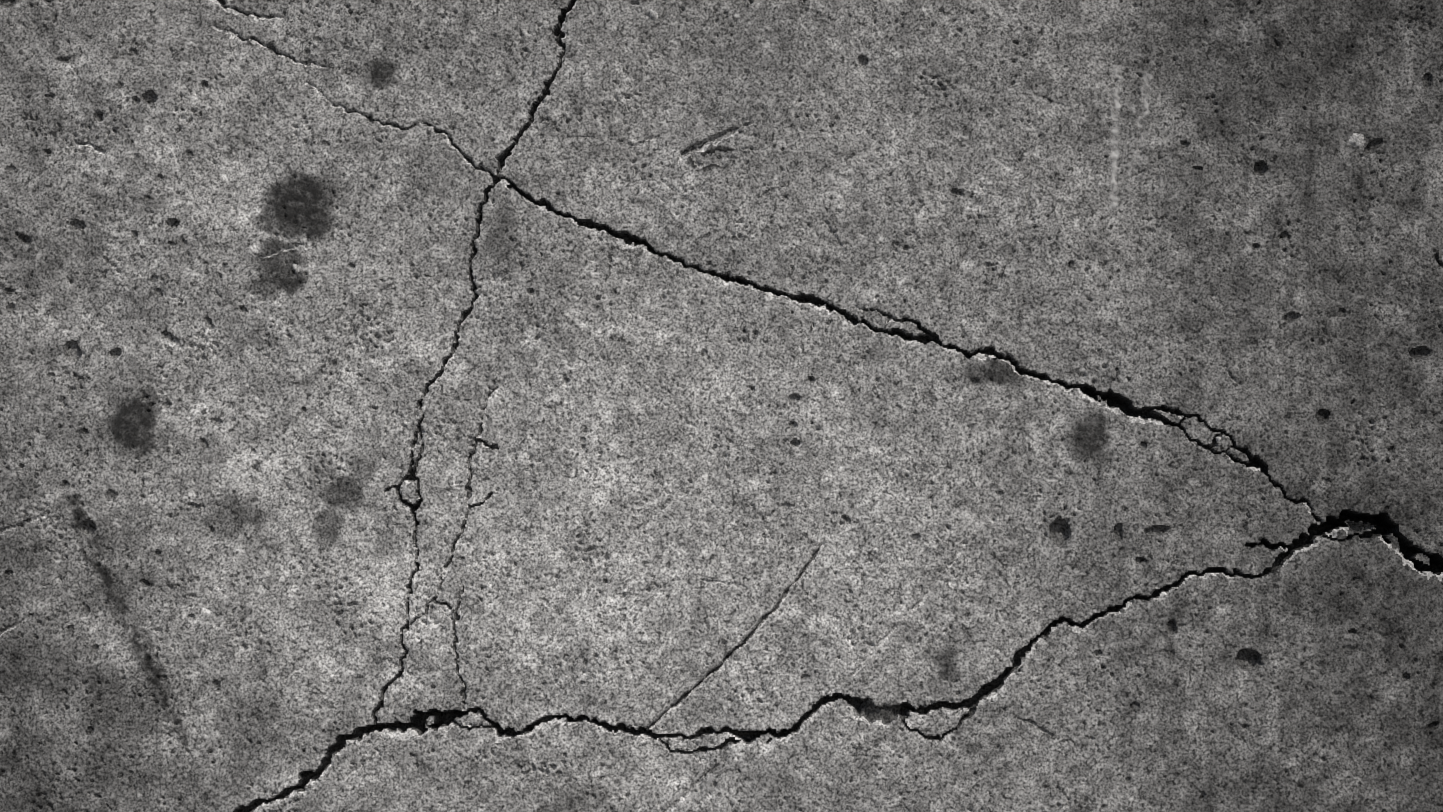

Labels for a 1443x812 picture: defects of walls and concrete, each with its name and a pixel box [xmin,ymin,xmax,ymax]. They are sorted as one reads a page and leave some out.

crack [208,0,283,23]
crack [211,26,327,69]
crack [330,104,357,115]
crack [365,115,417,130]
crack [417,0,1323,523]
crack [384,415,426,615]
crack [438,383,499,590]
crack [233,509,1443,812]